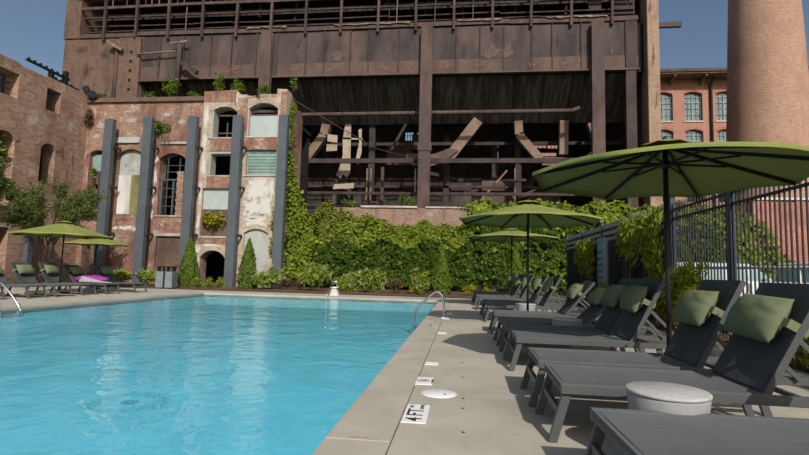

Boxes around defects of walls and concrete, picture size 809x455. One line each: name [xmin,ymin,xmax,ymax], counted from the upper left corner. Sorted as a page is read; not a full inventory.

peeling [237,174,275,242]